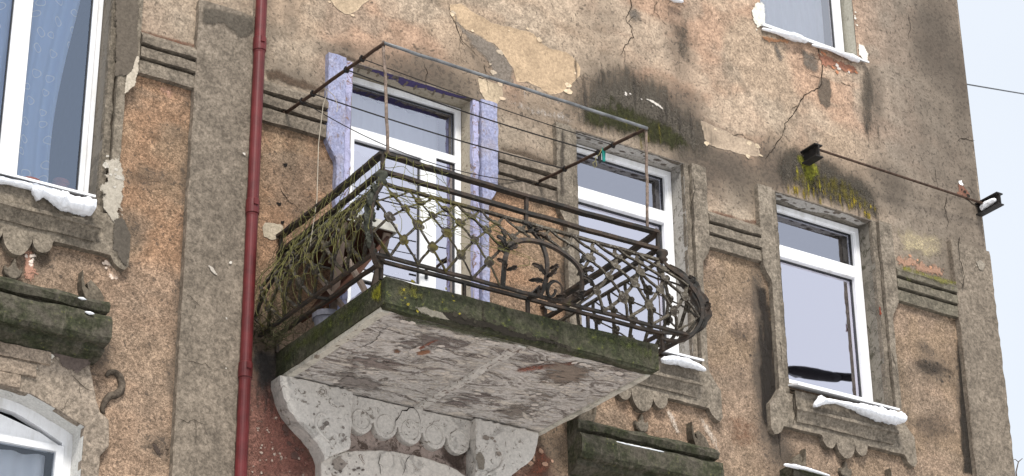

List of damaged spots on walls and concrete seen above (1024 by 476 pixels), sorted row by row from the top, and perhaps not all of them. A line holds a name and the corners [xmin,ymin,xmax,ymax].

peeling [125,56,139,93]
peeling [450,3,580,104]
water stain [575,64,706,156]
crack [622,0,665,62]
peeling [701,121,763,158]
crack [733,49,846,159]
flaking render [818,44,868,74]
peeling [100,155,124,223]
water stain [778,148,877,217]
flaking render [896,235,944,276]